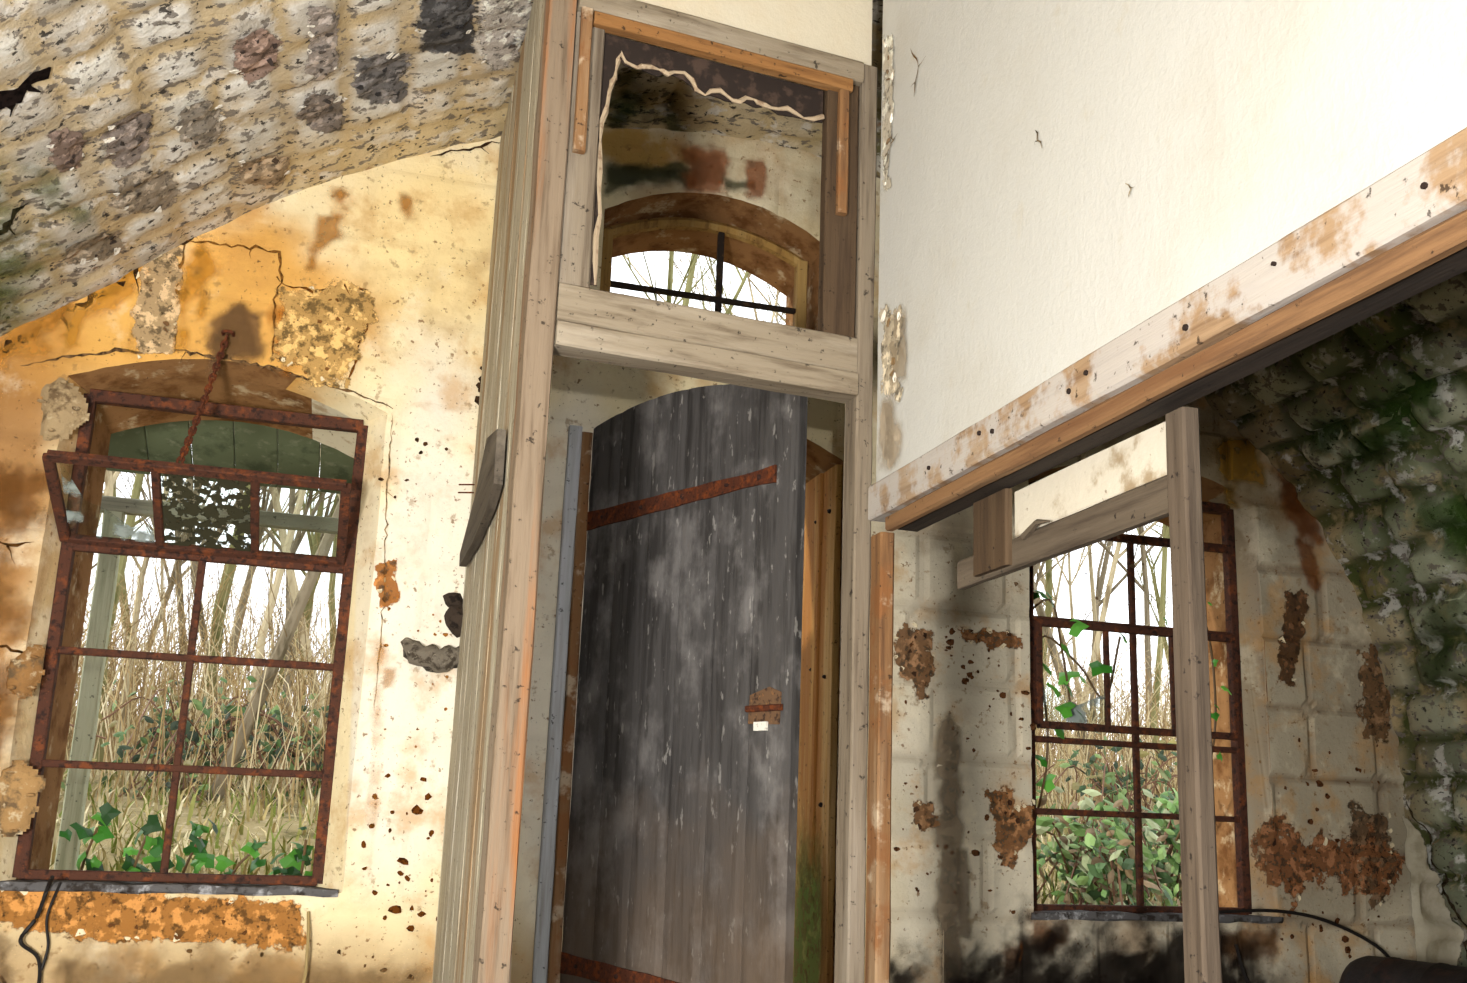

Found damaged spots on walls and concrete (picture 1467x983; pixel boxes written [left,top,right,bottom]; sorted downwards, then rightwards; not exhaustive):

crack [0,67,51,117]
spalling [130,247,183,359]
spalling [271,280,378,389]
damp [0,472,47,529]
peeling [374,559,400,611]
peeling [893,622,1023,706]
peeling [1277,589,1309,687]
damp [935,715,971,983]
peeling [894,782,1035,873]
peeling [1250,767,1406,941]
spalling [0,890,311,971]
damp [890,962,920,983]